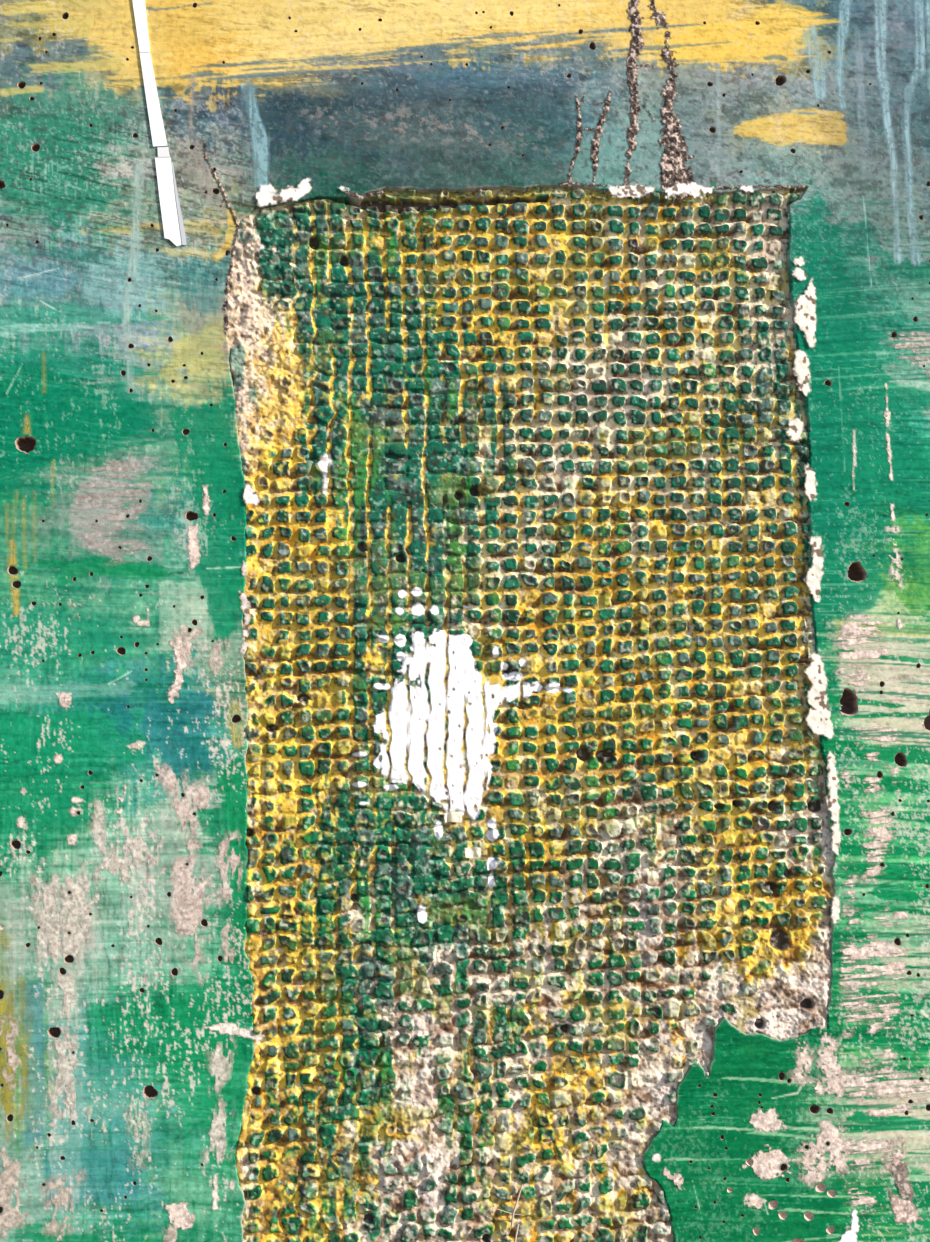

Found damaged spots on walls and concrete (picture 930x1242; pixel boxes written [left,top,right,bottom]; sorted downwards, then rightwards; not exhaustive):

peeling [74,461,150,561]
peeling [133,609,150,626]
peeling [56,692,72,707]
spalling [157,178,930,1242]
peeling [31,785,163,1132]
peeling [130,1096,148,1166]